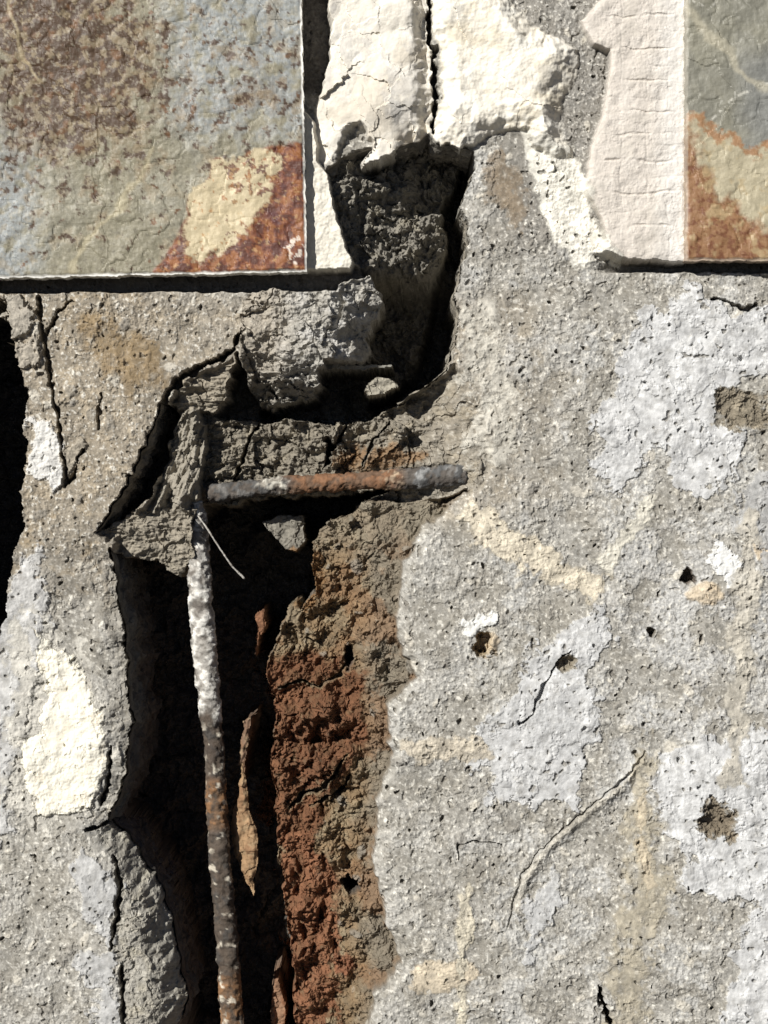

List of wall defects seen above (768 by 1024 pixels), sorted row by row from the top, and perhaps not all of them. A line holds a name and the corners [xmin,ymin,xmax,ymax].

crack [424,0,440,135]
crack [34,295,104,490]
spalling [0,136,493,1024]
rust [294,553,323,610]
rust [231,652,368,1024]
crack [507,751,647,930]